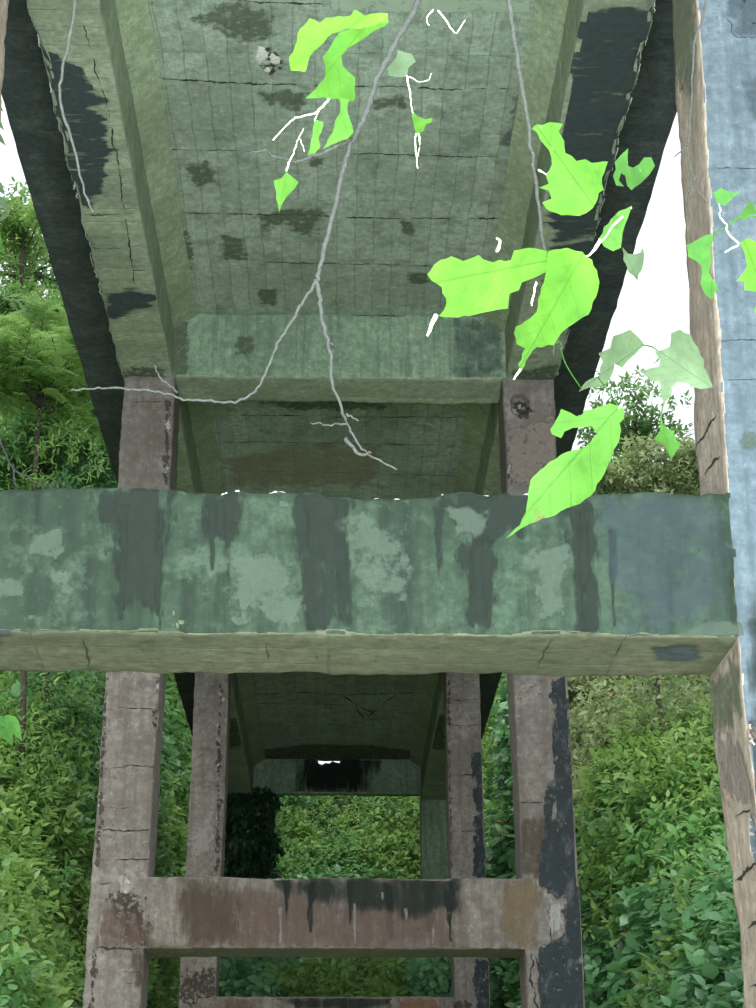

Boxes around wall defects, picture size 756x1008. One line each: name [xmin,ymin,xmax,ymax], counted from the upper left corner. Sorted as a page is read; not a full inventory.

leakage [192,2,274,42]
spalling [255,46,283,75]
peeling [506,401,555,495]
leakage [98,488,177,629]
leakage [202,444,377,631]
leakage [521,797,553,877]
leakage [307,882,315,932]
leakage [446,906,455,941]
leakage [547,889,563,932]
crack [528,905,556,1008]
spalling [179,967,215,1007]
leakage [538,963,546,1007]